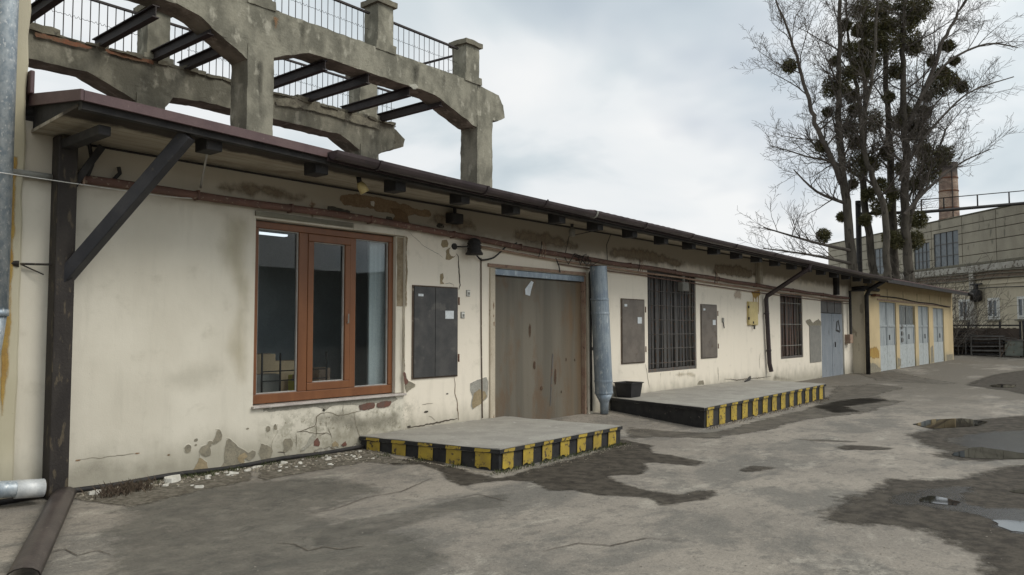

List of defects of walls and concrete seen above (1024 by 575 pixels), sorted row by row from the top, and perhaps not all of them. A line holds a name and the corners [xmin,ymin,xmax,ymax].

flaking render [323,194,457,285]
flaking render [183,372,417,470]
crack [281,411,360,453]
flaking render [469,377,489,410]